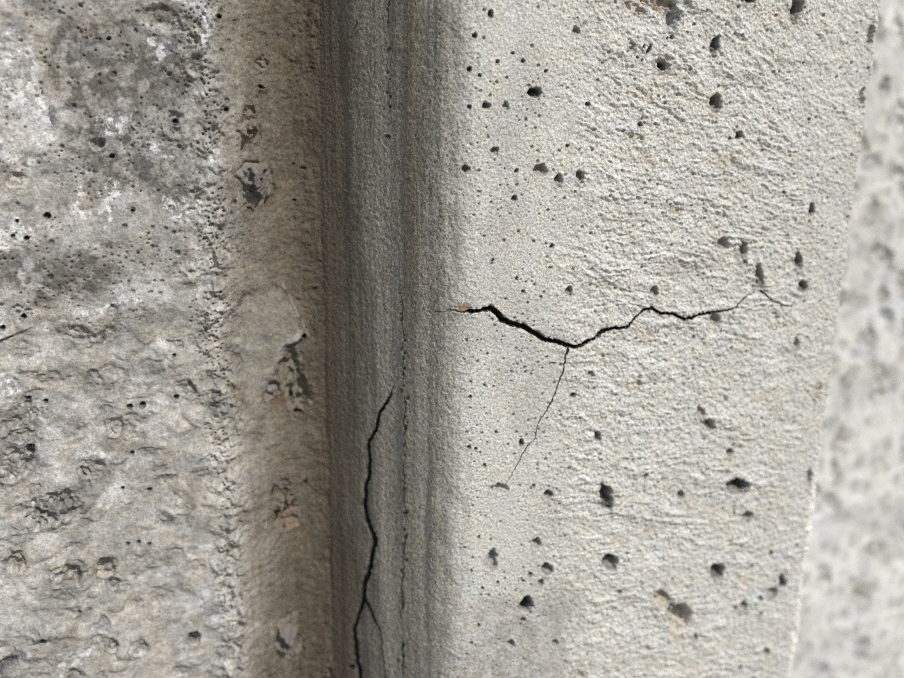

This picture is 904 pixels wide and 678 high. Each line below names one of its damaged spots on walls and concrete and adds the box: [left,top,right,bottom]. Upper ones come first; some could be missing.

crack [353,294,407,678]
crack [434,290,796,479]